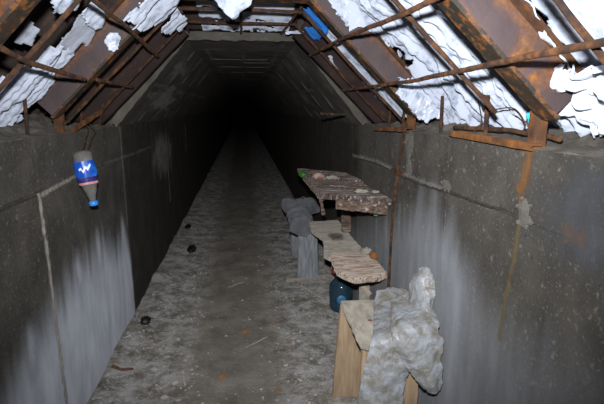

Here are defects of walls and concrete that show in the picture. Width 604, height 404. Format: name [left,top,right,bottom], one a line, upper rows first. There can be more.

leakage [10,176,135,404]